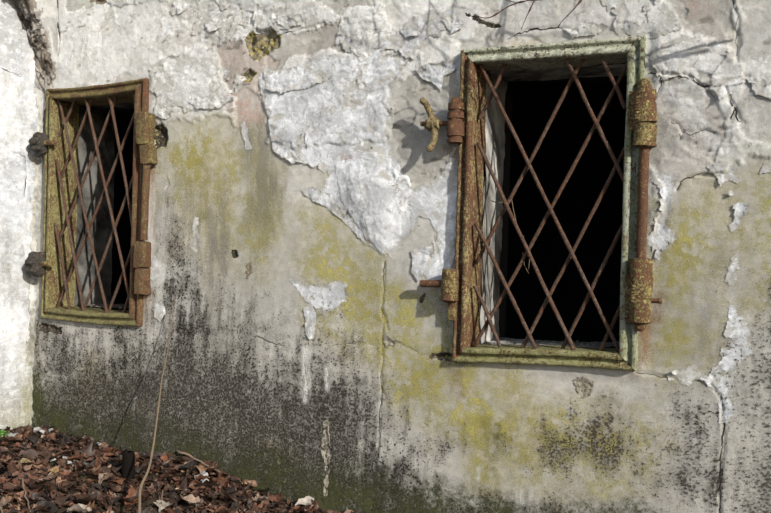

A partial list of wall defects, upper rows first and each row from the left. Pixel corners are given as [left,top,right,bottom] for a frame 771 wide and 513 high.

peeling [149,0,501,303]
peeling [289,279,349,340]
crack [332,265,428,469]
water stain [31,192,771,513]
peeling [667,305,753,425]
crack [716,404,725,513]